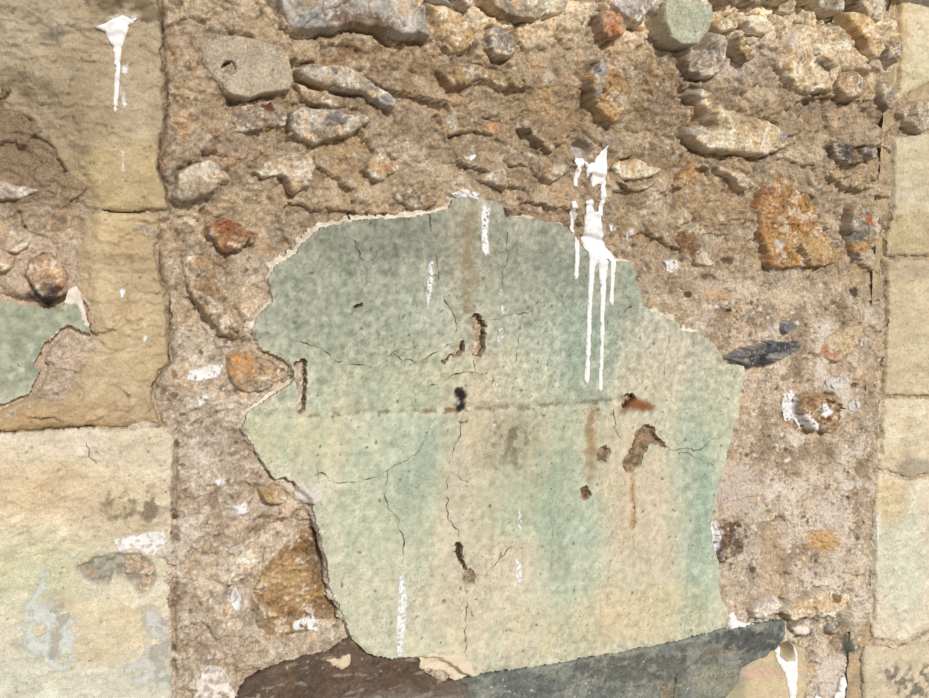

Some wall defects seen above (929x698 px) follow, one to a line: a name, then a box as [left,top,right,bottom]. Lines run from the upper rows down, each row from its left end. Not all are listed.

crack [389,300,457,361]
flaking render [441,313,485,364]
flaking render [292,358,307,413]
flaking render [596,445,610,462]
flaking render [622,424,665,472]
flaking render [580,485,590,500]
flaking render [455,541,475,584]
flaking render [725,611,754,629]
flaking render [326,654,351,669]
flaking render [419,653,474,680]